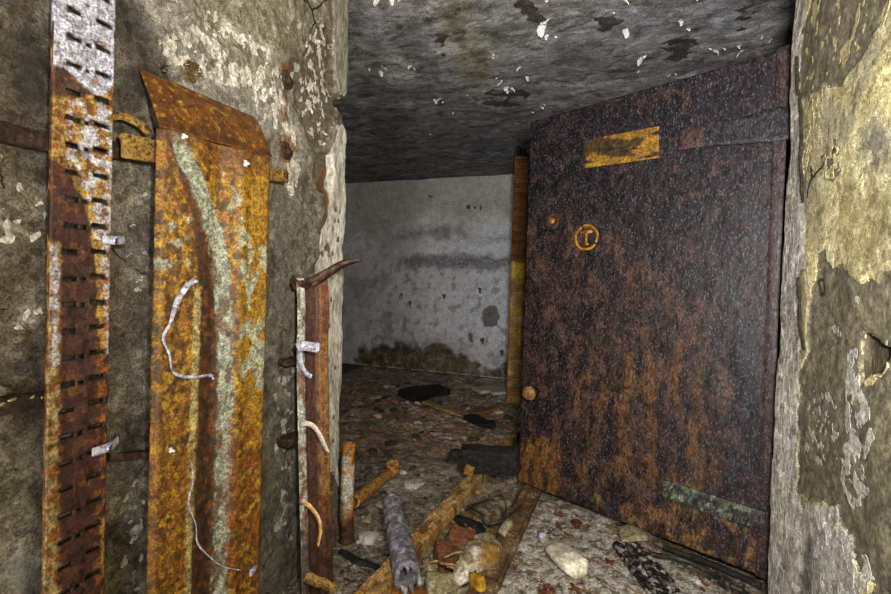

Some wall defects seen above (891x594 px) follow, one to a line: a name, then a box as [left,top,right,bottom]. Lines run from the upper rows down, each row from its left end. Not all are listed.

crack [303,0,327,33]
peeling [513,0,558,41]
peeling [593,12,629,39]
peeling [433,33,449,56]
peeling [482,67,531,107]
spalling [768,0,891,594]
water stain [354,342,507,378]